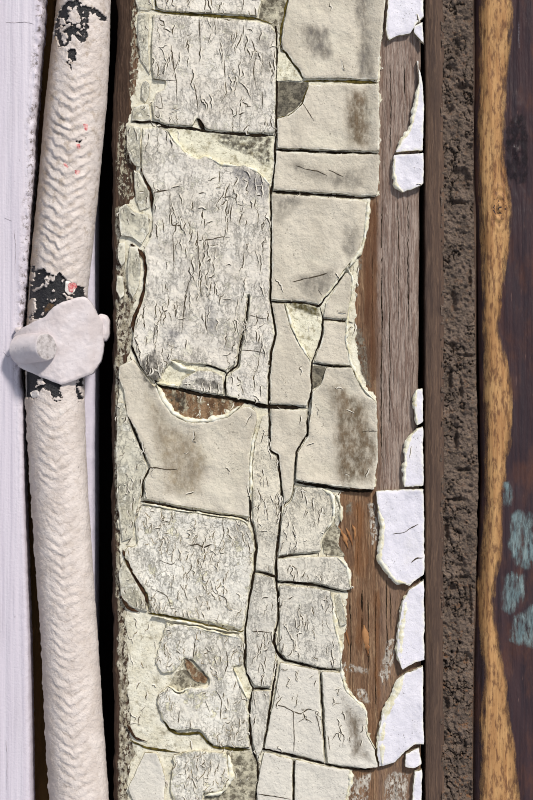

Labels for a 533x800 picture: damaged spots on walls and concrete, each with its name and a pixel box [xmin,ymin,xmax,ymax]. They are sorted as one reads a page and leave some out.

peeling [65,281,77,295]
crack [121,0,409,800]
peeling [114,0,425,800]